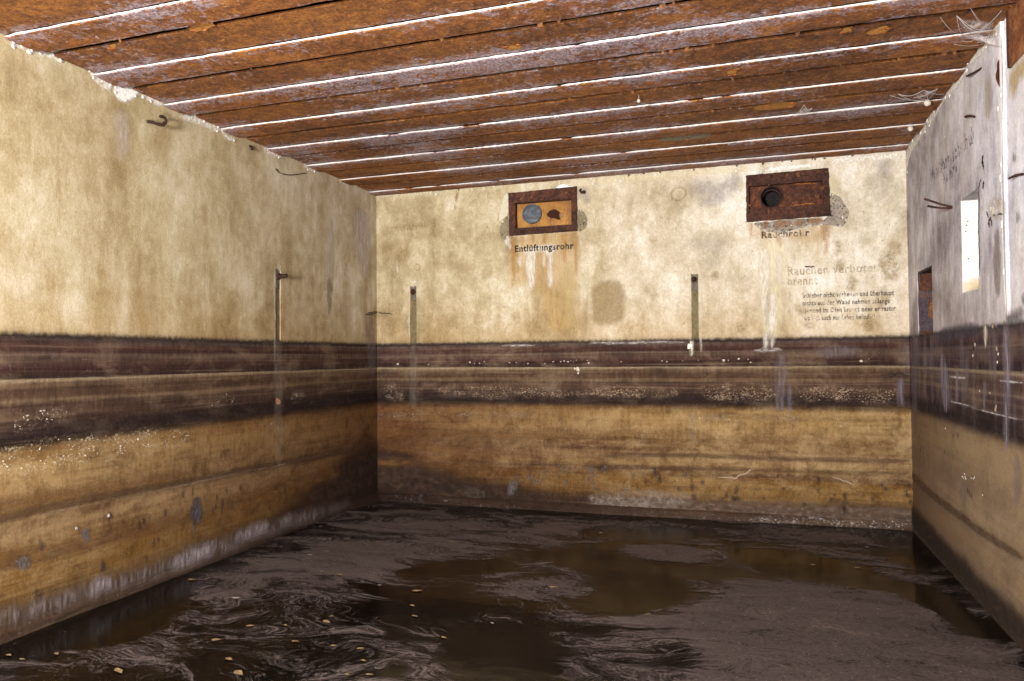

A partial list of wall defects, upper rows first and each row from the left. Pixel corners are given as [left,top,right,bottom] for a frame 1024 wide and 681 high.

damp [0,25,1024,448]
flaking render [735,193,849,233]
damp [0,445,532,595]